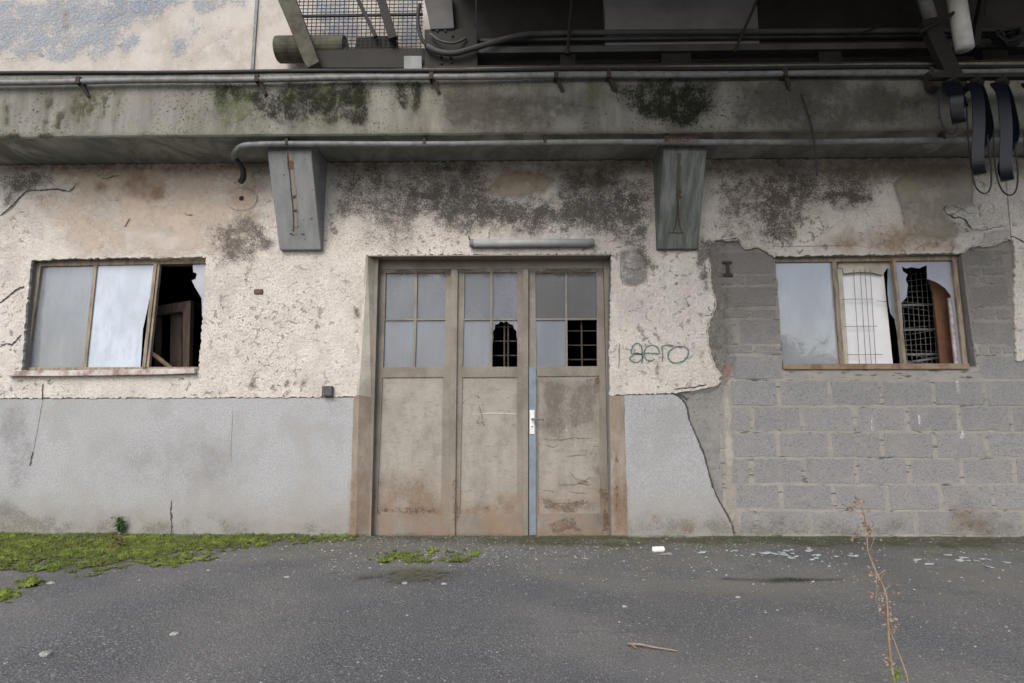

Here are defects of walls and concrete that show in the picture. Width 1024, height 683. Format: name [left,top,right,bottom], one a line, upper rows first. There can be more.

crack [1,172,120,216]
water stain [213,217,273,270]
water stain [330,160,655,266]
water stain [697,238,712,289]
water stain [710,157,963,246]
spalling [672,244,733,394]
spalling [844,269,888,364]
crack [29,385,43,466]
crack [675,393,735,534]